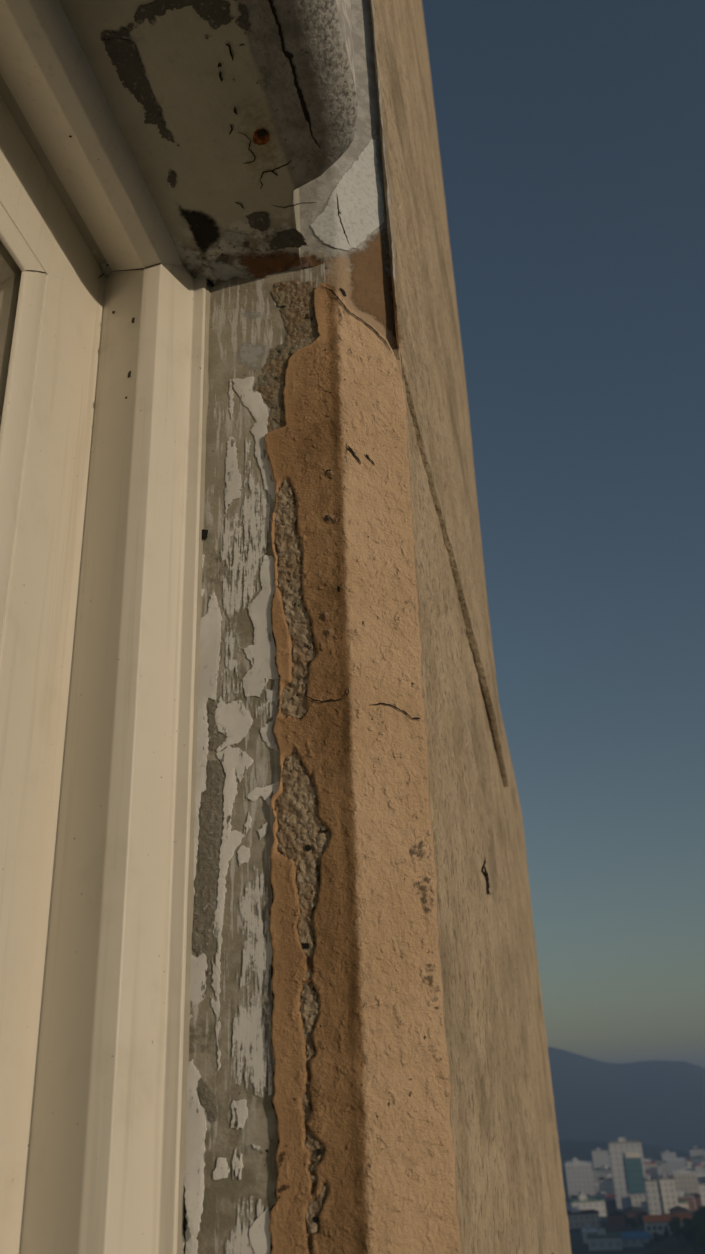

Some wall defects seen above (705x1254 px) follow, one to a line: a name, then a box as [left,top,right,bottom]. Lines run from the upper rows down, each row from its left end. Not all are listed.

peeling [100,0,250,148]
corrosion [253,129,270,145]
crack [218,44,349,243]
crack [268,0,321,149]
spalling [243,212,308,250]
spalling [183,280,330,1254]